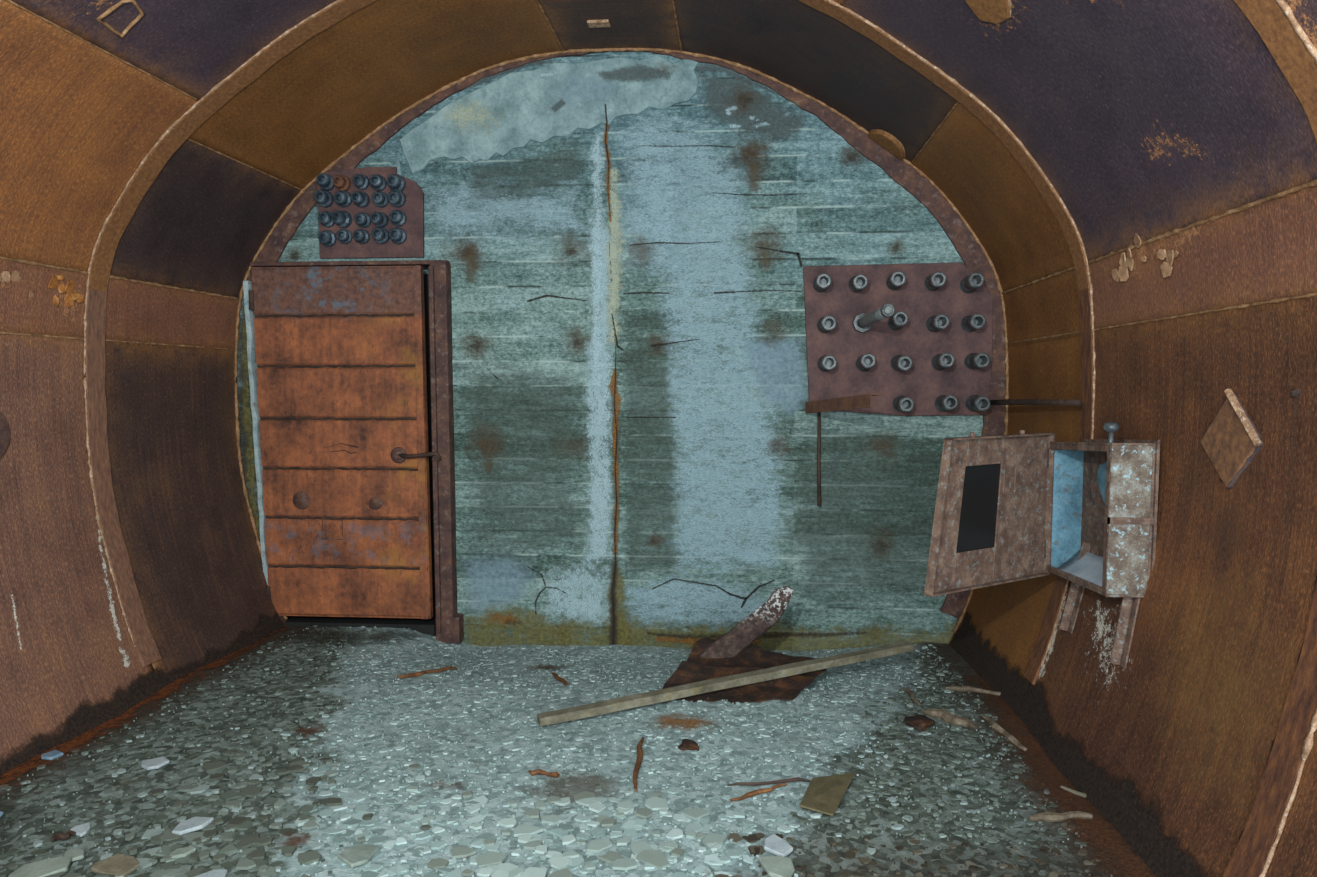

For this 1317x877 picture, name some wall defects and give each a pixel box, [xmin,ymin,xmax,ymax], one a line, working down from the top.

corrosion [1287,0,1317,47]
corrosion [1141,119,1206,165]
water stain [426,116,802,649]
crack [652,578,775,608]
corrosion [0,628,290,787]
water stain [752,593,1208,877]